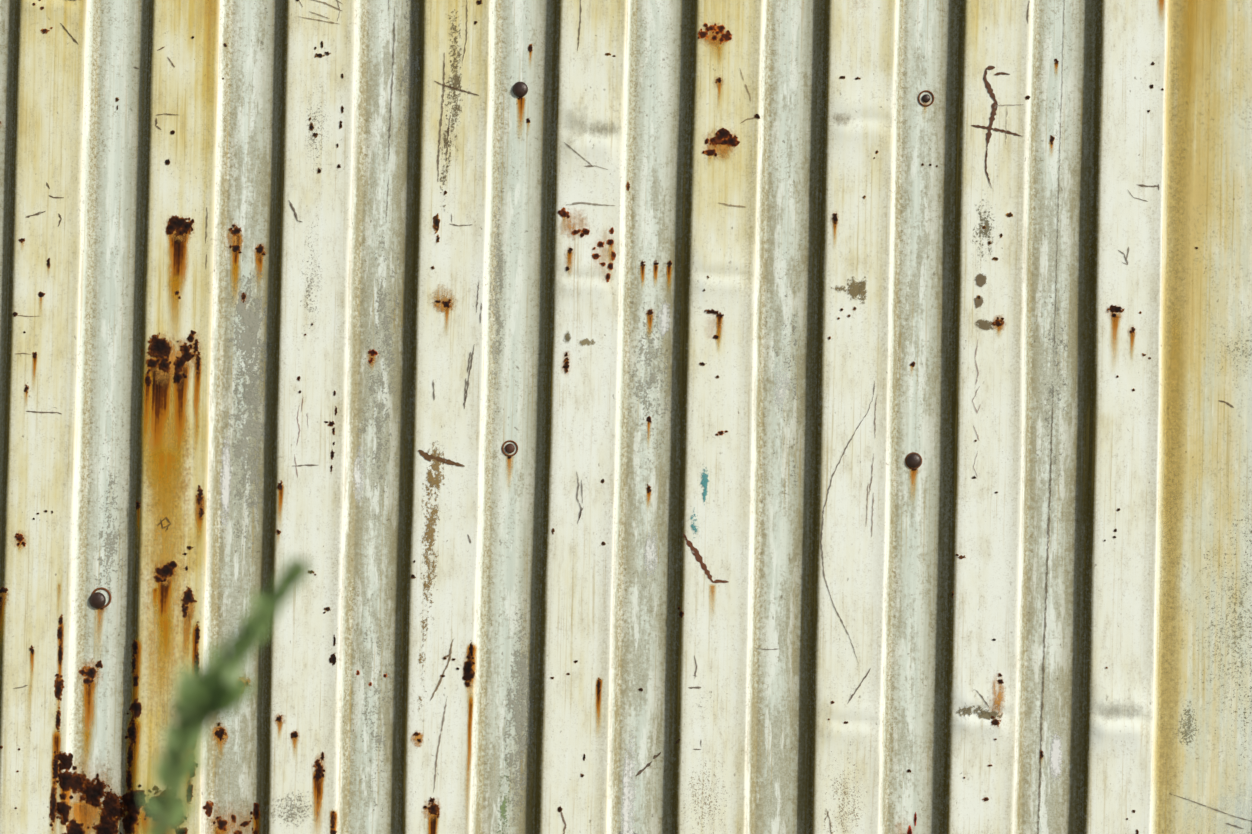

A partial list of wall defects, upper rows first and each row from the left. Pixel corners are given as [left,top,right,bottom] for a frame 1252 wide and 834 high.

rust [698,23,732,51]
rust [702,128,740,158]
rust [166,215,194,303]
rust [558,207,616,282]
rust [141,330,201,504]
rust [196,485,204,532]
rust [153,560,200,675]
rust [49,615,167,834]
rust [213,722,228,750]